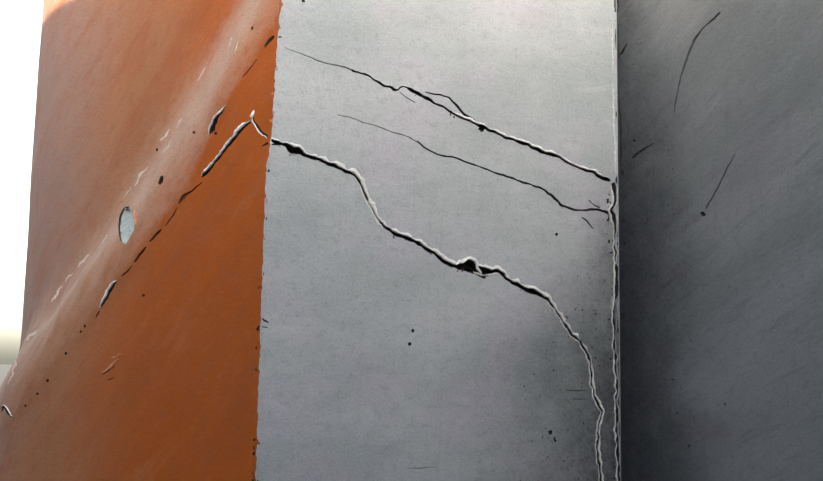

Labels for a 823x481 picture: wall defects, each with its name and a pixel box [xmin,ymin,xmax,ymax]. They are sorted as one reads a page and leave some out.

peeling [118,187,136,244]
crack [80,0,622,481]